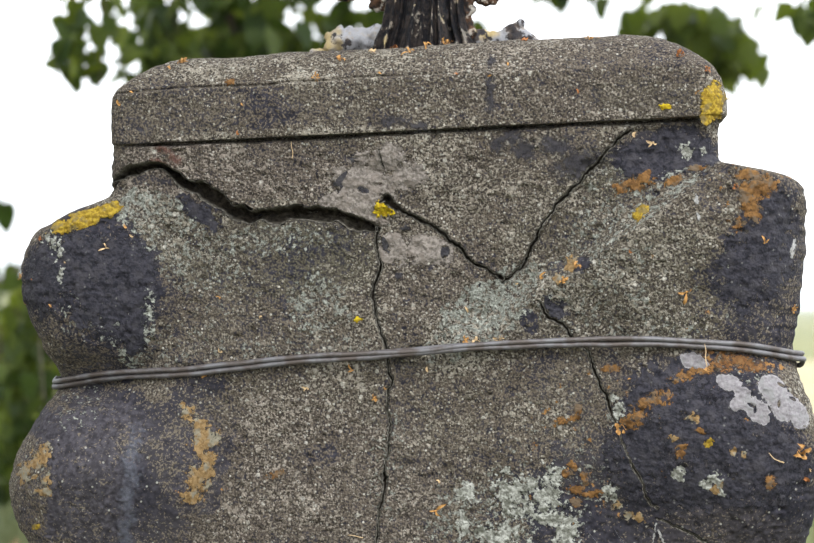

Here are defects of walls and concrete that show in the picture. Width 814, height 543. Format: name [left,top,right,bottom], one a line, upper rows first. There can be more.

crack [380,129,633,283]
crack [113,161,394,543]
crack [538,301,708,543]